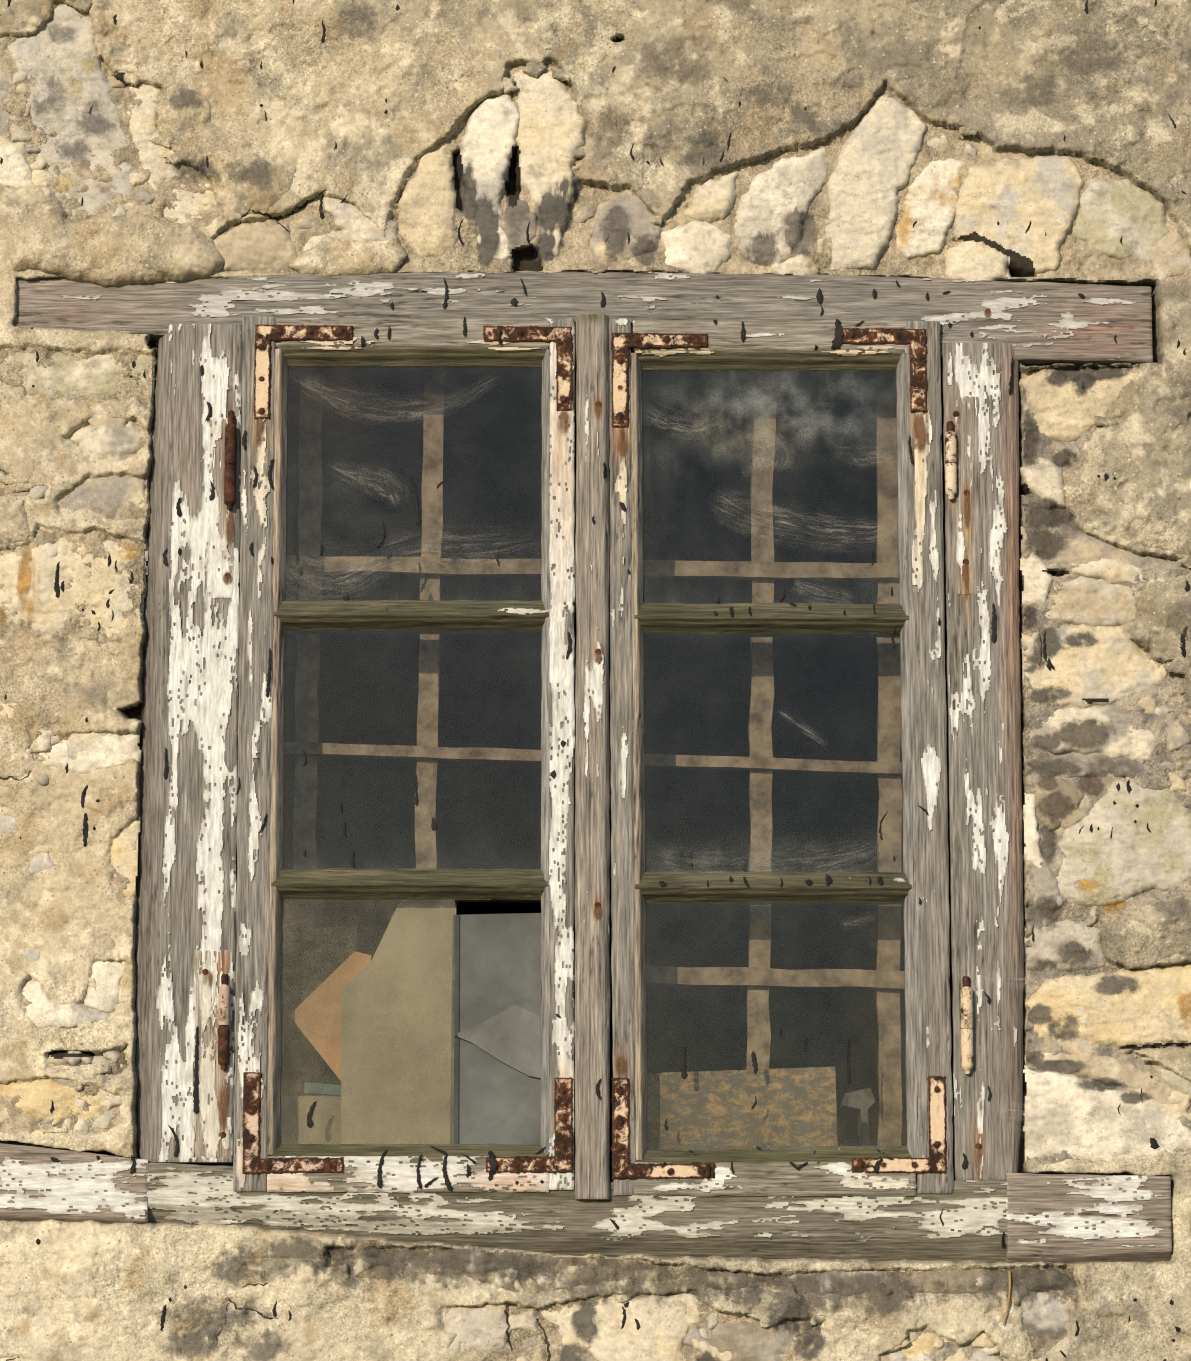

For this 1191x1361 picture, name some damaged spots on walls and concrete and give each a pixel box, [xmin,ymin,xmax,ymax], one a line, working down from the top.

spalling [0,0,1191,317]
peeling [584,394,599,463]
peeling [921,290,1110,741]
peeling [0,324,565,1235]
peeling [583,627,604,777]
peeling [964,759,1009,950]
spalling [1013,357,1191,1165]
peeling [975,966,983,1021]
peeling [991,961,1001,1030]
peeling [592,1069,1163,1247]
spalling [326,1245,1087,1361]